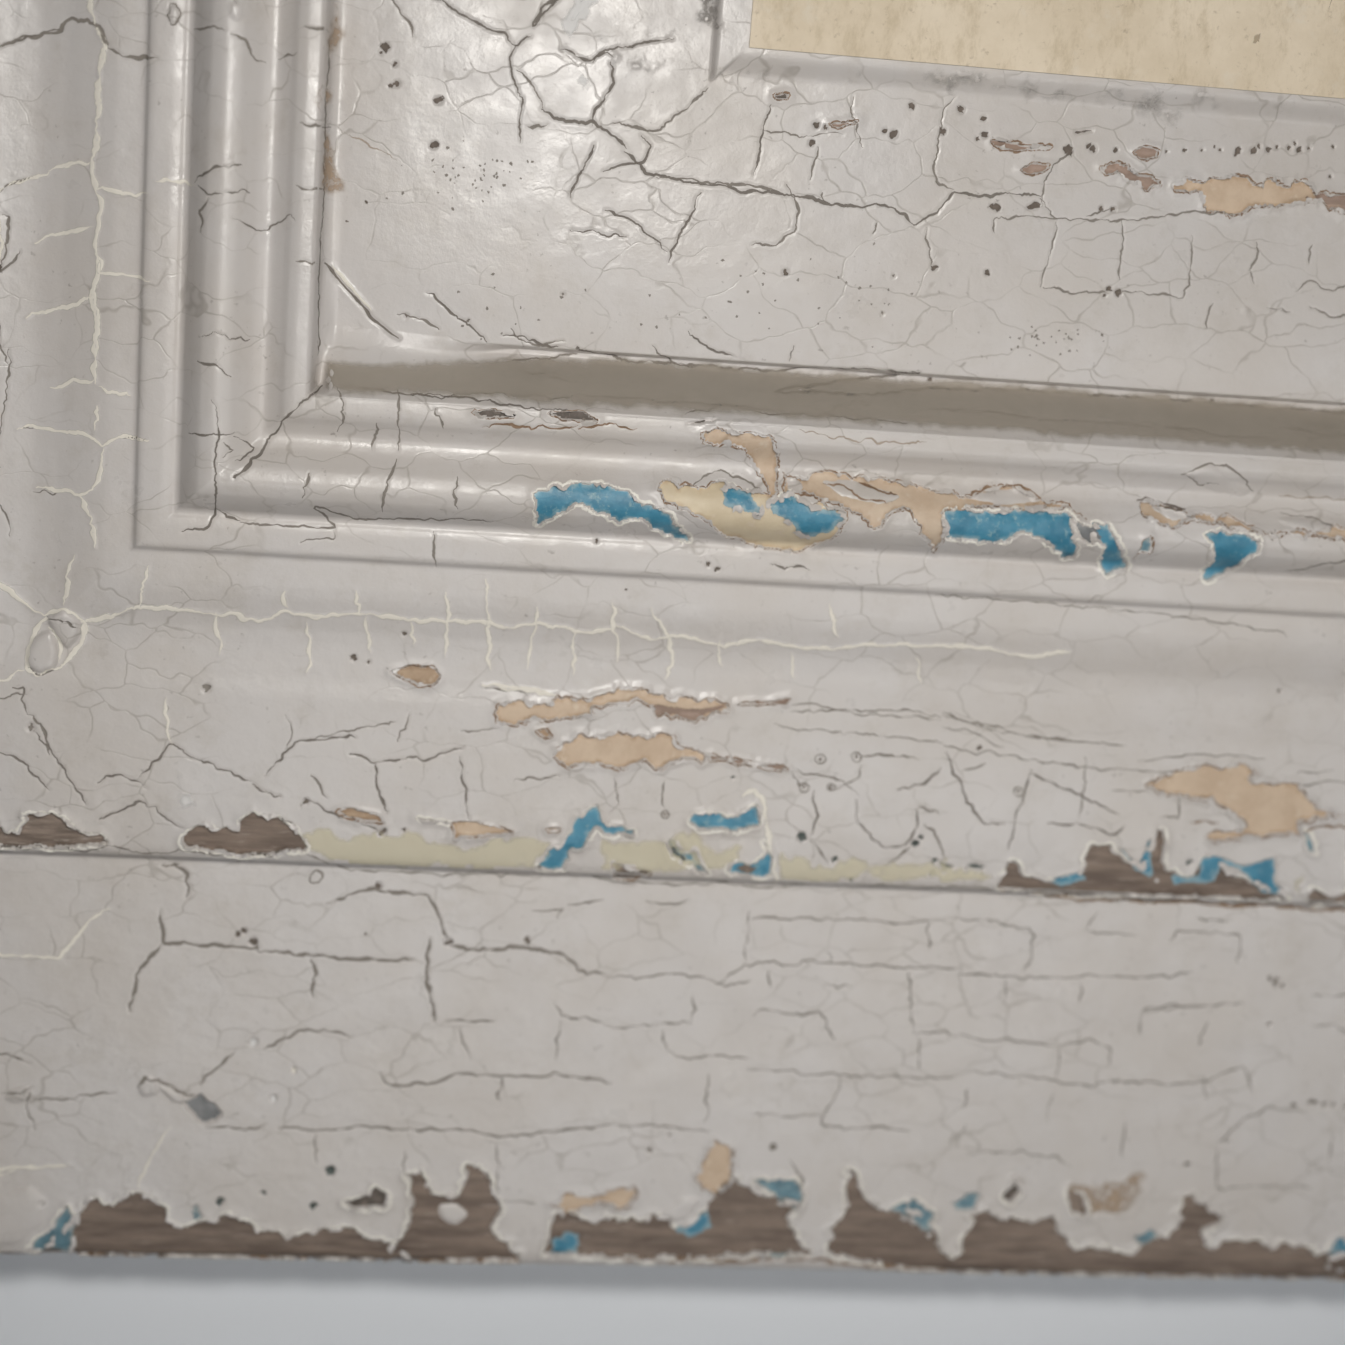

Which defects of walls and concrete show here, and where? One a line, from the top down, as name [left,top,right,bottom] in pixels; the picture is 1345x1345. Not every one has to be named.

peeling [976,116,1345,219]
crack [1249,242,1345,318]
peeling [383,391,599,426]
crack [0,0,1287,882]
crack [1291,407,1344,433]
peeling [493,686,793,773]
peeling [177,810,311,860]
peeling [533,804,638,873]
peeling [664,788,779,885]
peeling [995,763,1345,910]
peeling [24,1161,523,1264]
peeling [540,1139,1345,1281]